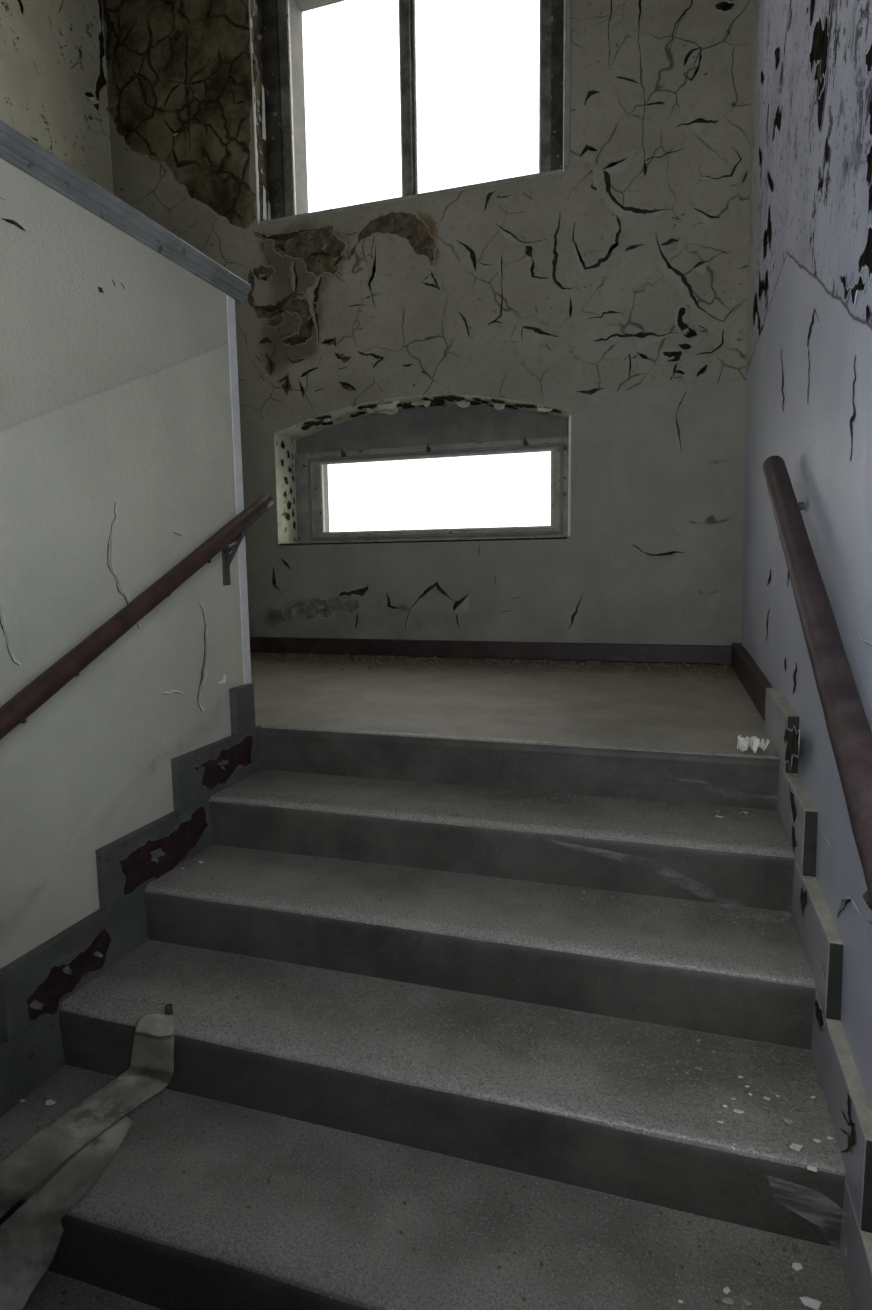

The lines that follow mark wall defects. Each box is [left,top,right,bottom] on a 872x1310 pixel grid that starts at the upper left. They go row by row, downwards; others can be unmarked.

spalling [71,0,562,418]
crack [290,236,376,343]
crack [422,0,748,354]
peeling [753,101,783,335]
peeling [806,0,829,191]
peeling [838,101,872,323]
crack [107,503,141,629]
crack [162,602,226,712]
crack [355,582,470,629]
crack [632,544,684,562]
peeling [117,734,253,897]
peeling [25,927,112,1021]